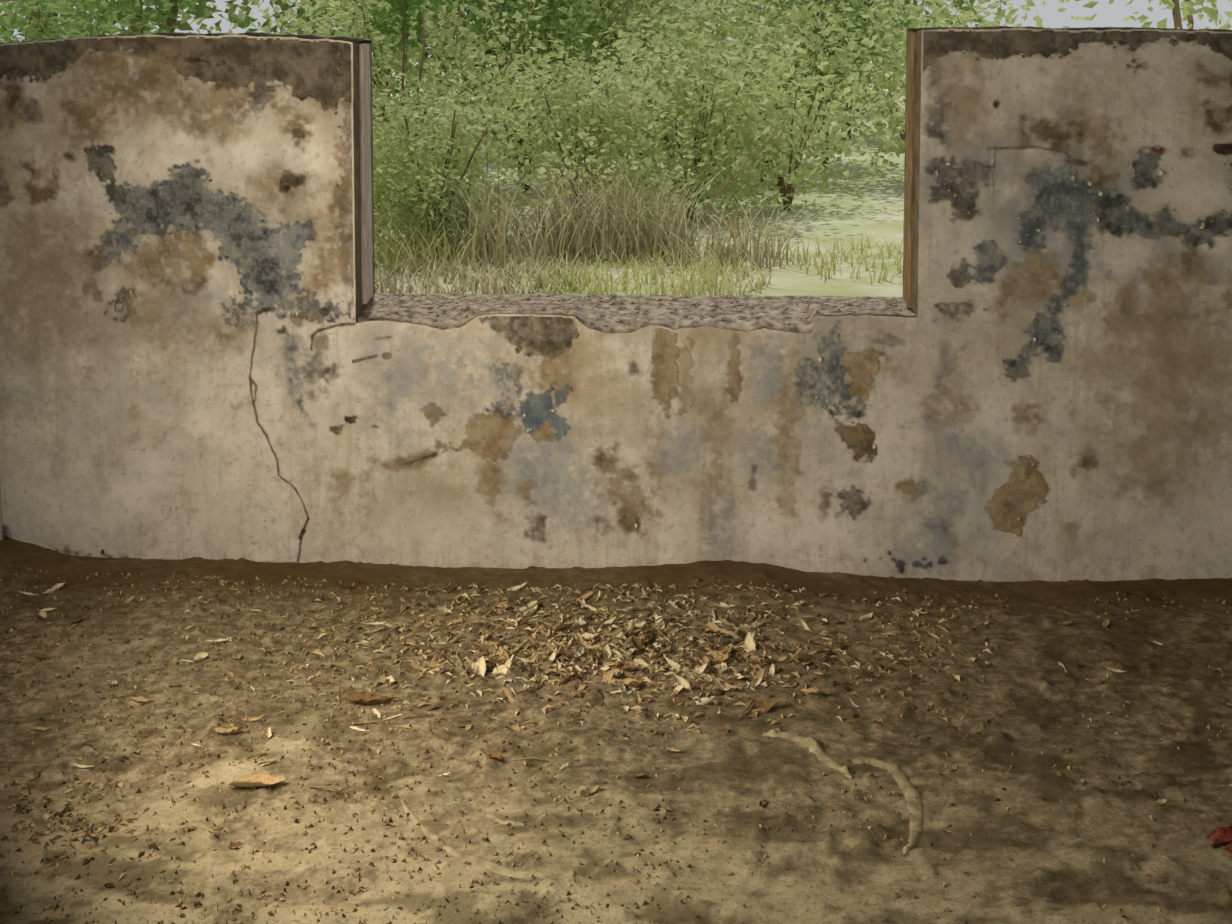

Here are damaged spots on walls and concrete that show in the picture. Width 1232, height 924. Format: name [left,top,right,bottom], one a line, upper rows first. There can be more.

peeling [83,145,351,333]
peeling [925,156,994,220]
peeling [934,240,1006,322]
peeling [1003,144,1232,381]
crack [249,308,309,562]
spalling [481,316,578,441]
peeling [793,321,877,462]